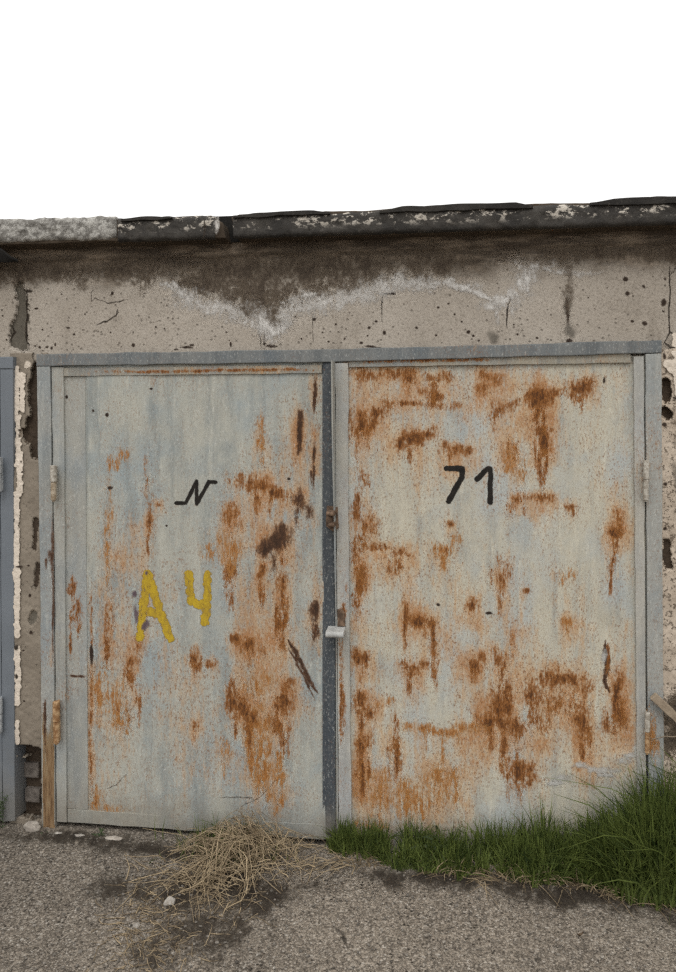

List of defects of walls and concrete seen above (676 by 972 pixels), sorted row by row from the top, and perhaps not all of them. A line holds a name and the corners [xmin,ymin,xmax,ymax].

water stain [0,240,676,343]
peeling [6,281,56,706]
corrosion [341,358,598,617]
corrosion [66,576,143,774]
corrosion [120,367,318,816]
corrosion [309,600,321,640]
corrosion [399,595,439,696]
spalling [662,527,673,569]
spalling [15,720,42,787]
corrosion [339,636,628,835]
spalling [663,696,676,761]
spalling [23,801,42,821]